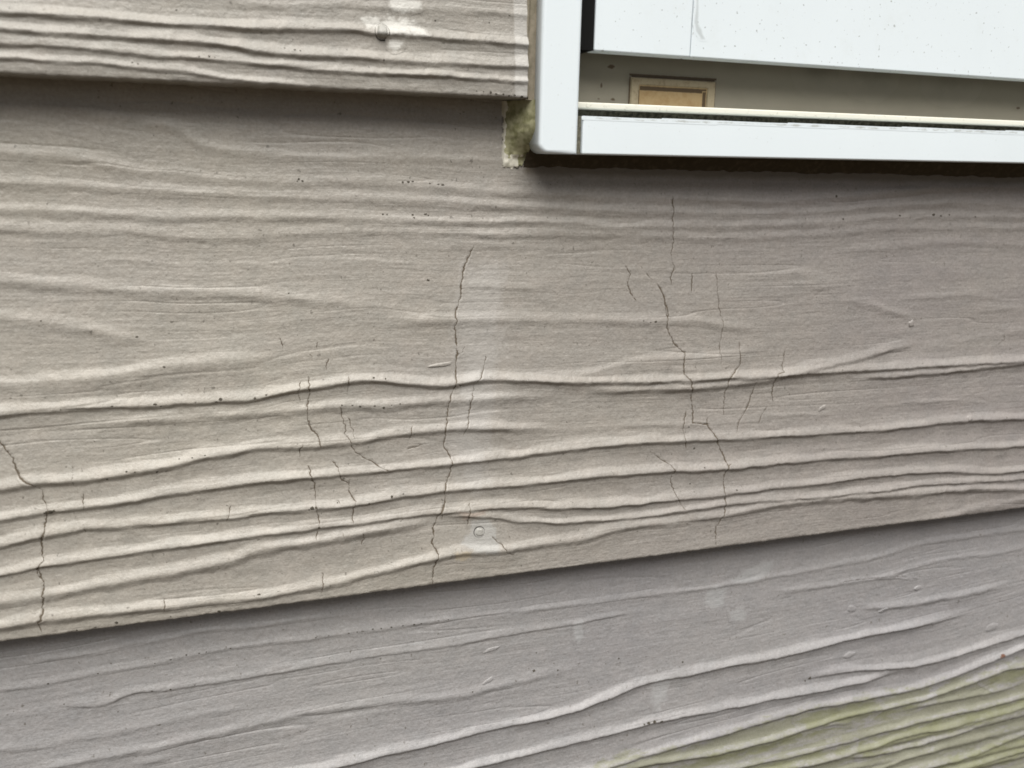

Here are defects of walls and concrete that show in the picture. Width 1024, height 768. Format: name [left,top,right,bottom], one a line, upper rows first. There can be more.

crack [0,442,48,632]
crack [298,342,390,544]
crack [407,248,486,584]
crack [625,198,785,539]